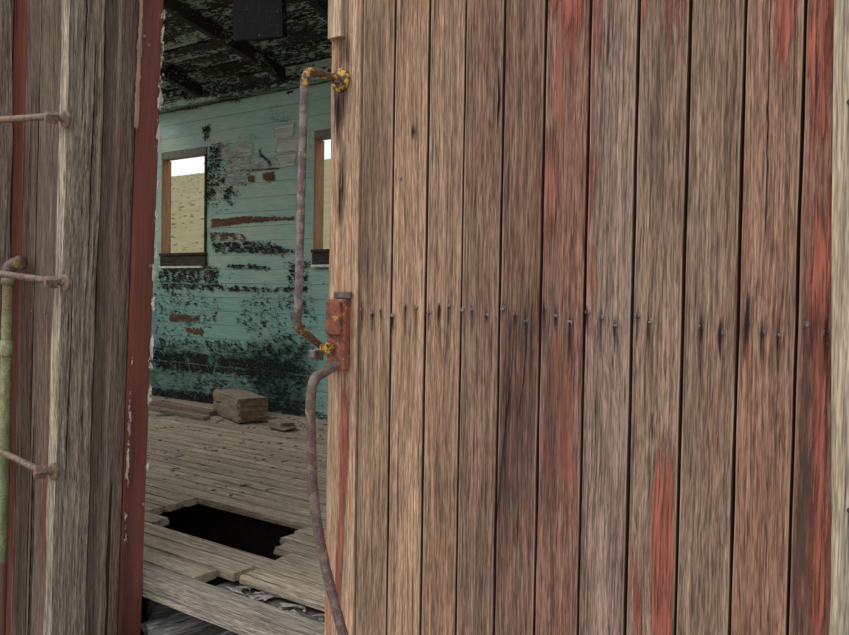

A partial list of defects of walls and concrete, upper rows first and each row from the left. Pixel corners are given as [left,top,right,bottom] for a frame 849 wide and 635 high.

peeling [156,11,314,154]
peeling [548,0,583,37]
peeling [771,0,797,98]
peeling [807,0,834,138]
peeling [202,123,279,208]
peeling [544,115,559,271]
peeling [586,0,603,331]
peeling [148,210,318,386]
peeling [147,385,214,405]
peeling [268,396,306,416]